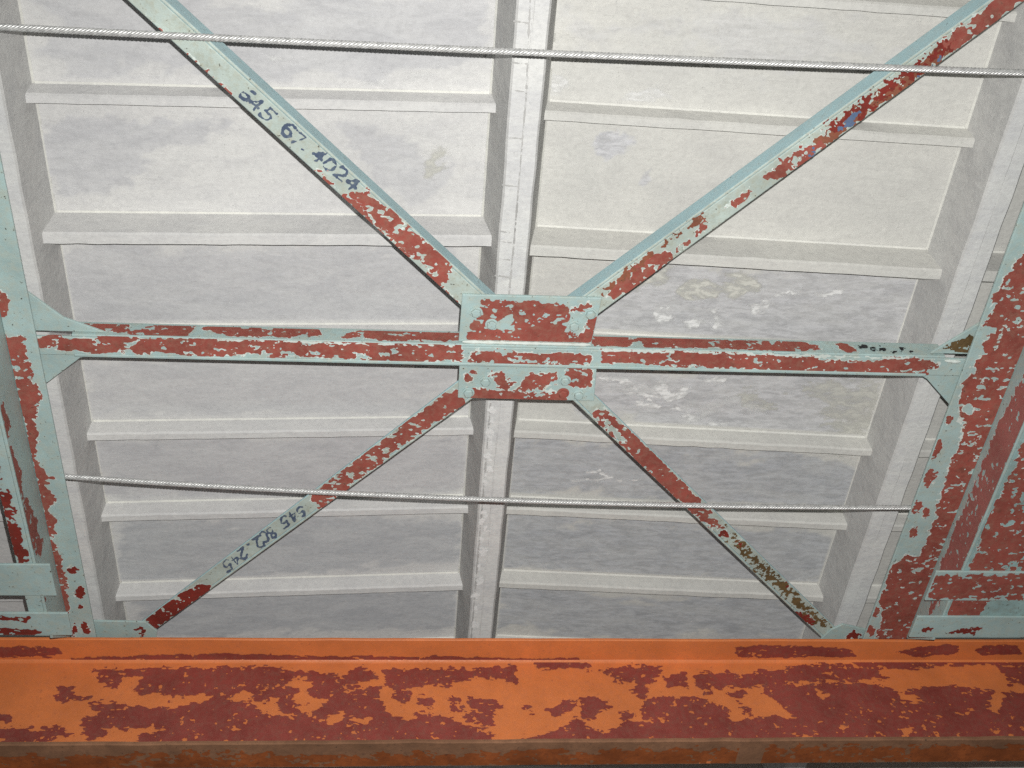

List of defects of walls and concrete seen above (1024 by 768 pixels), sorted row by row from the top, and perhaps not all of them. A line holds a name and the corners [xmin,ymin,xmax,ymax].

peeling [763,0,1024,180]
peeling [314,168,460,303]
peeling [724,186,753,208]
peeling [0,212,1024,742]
rust [721,520,833,628]